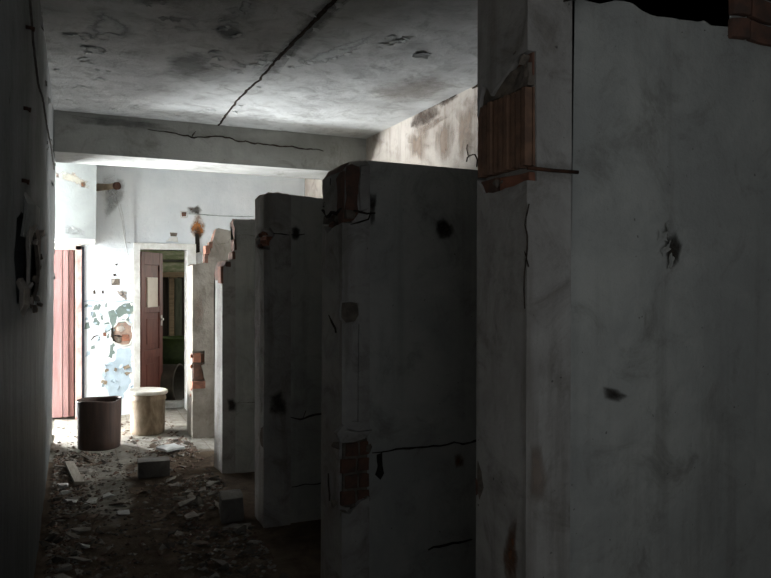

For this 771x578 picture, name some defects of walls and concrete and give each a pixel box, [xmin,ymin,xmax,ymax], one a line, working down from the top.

crack [148,0,345,151]
damp [411,97,454,158]
damp [459,110,471,152]
flaking render [478,51,535,193]
flaking render [16,192,55,317]
flaking render [203,242,213,263]
peeling [84,290,134,399]
flaking render [190,353,205,397]